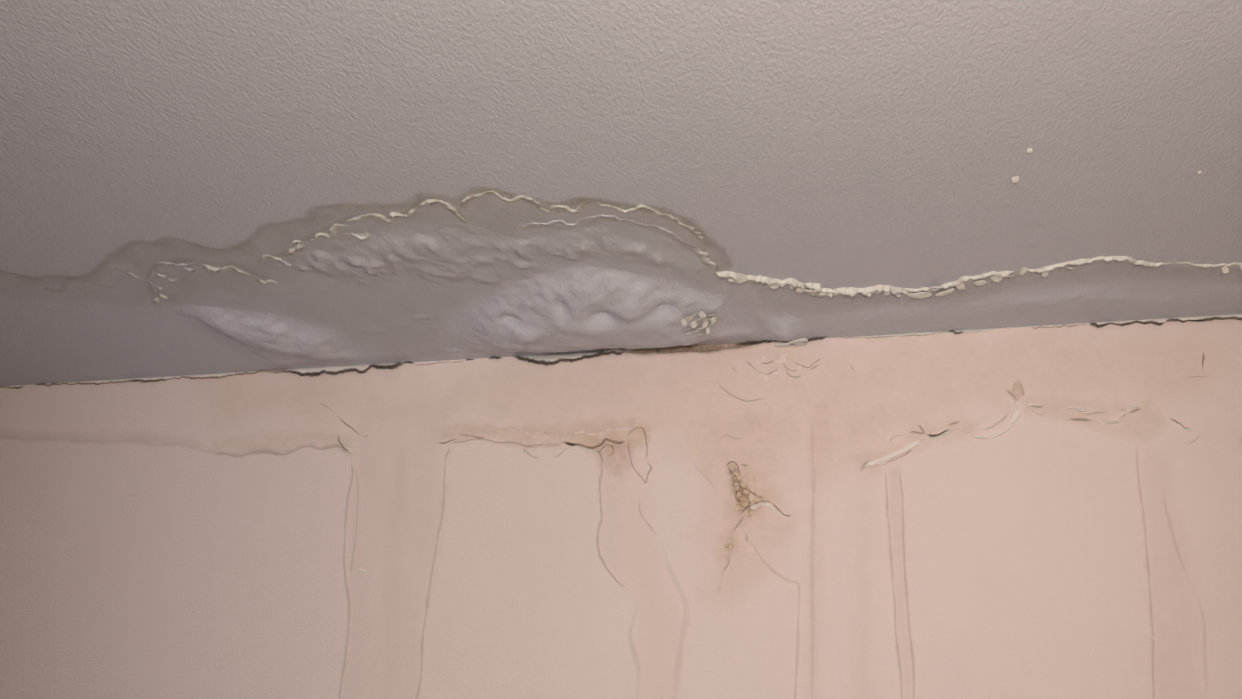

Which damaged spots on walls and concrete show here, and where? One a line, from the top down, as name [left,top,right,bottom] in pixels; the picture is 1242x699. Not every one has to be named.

peeling [125,190,1242,304]
crack [1035,316,1242,329]
crack [731,336,826,348]
crack [466,351,659,365]
crack [0,361,412,388]
crack [442,426,640,452]
peeling [864,426,961,468]